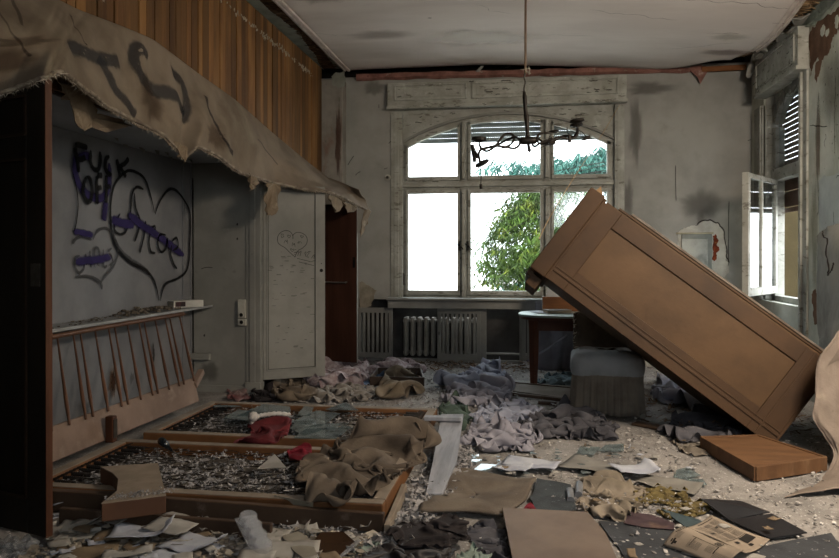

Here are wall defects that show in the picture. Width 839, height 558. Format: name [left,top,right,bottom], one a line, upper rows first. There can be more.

flaking render [809,7,839,83]
flaking render [677,219,729,277]
crack [817,175,839,276]